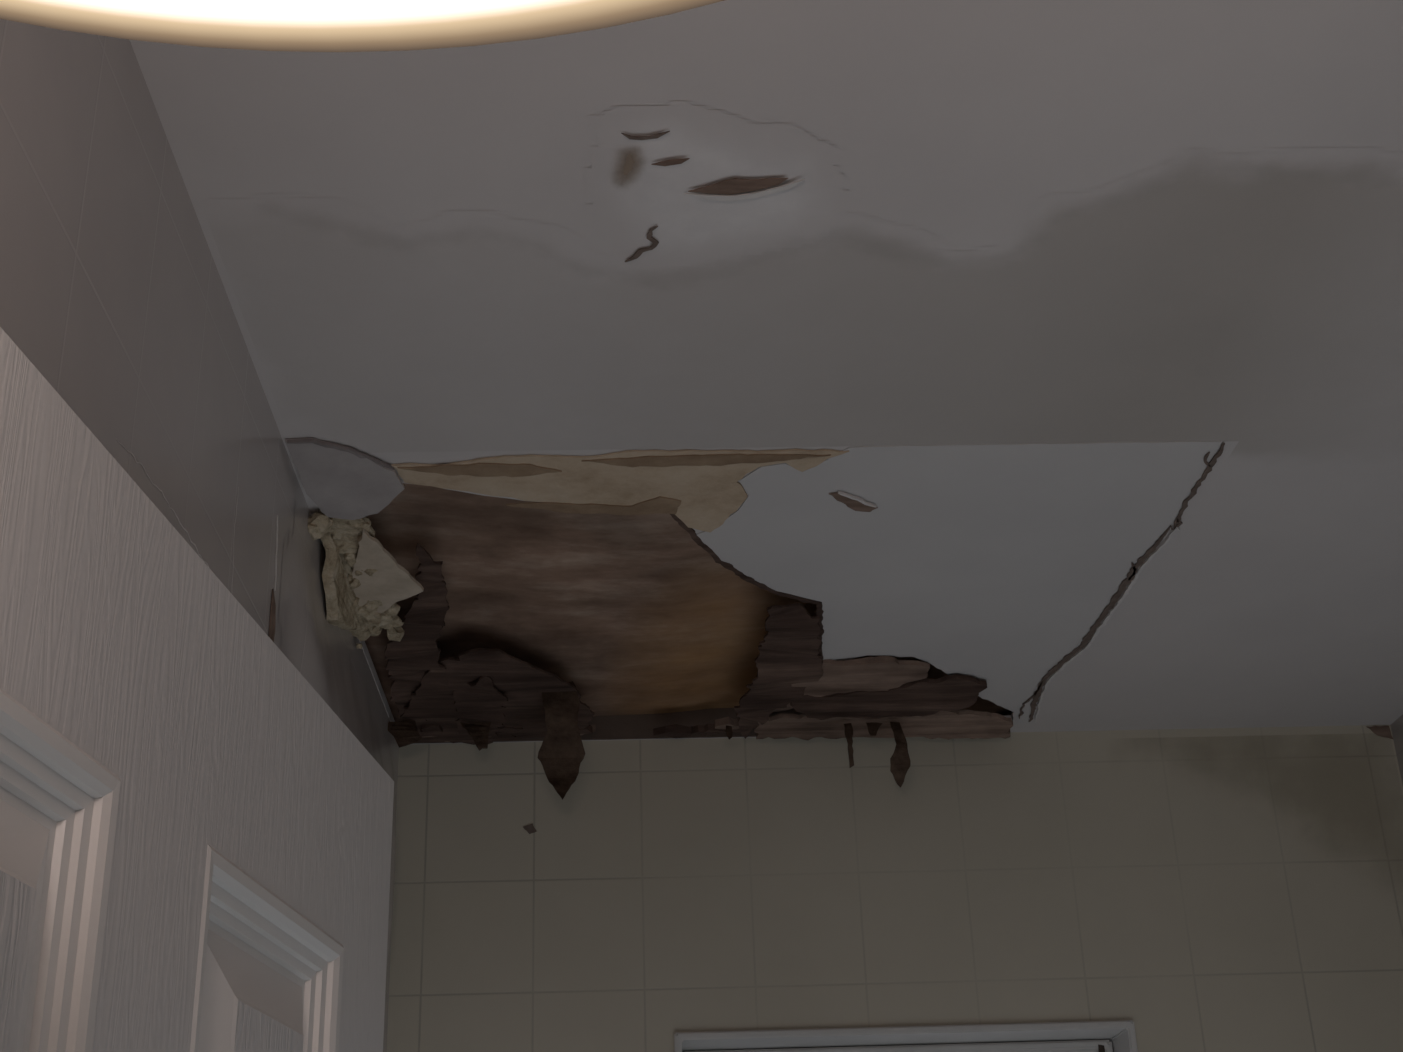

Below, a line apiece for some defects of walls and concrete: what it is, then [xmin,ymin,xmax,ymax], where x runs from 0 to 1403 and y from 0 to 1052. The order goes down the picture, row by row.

water stain [201,147,1403,471]
spalling [285,438,424,649]
crack [1019,443,1225,723]
spalling [581,708,757,740]